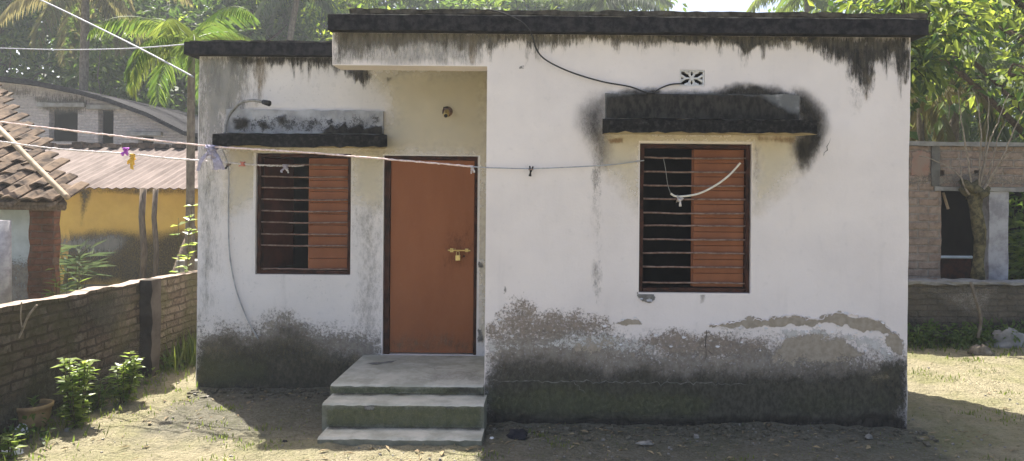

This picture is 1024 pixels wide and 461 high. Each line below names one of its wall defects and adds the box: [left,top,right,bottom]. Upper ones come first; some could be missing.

leakage [199,33,910,151]
leakage [586,84,825,165]
spalling [637,292,655,303]
leakage [196,311,381,389]
leakage [450,324,907,429]
peeling [638,311,904,368]